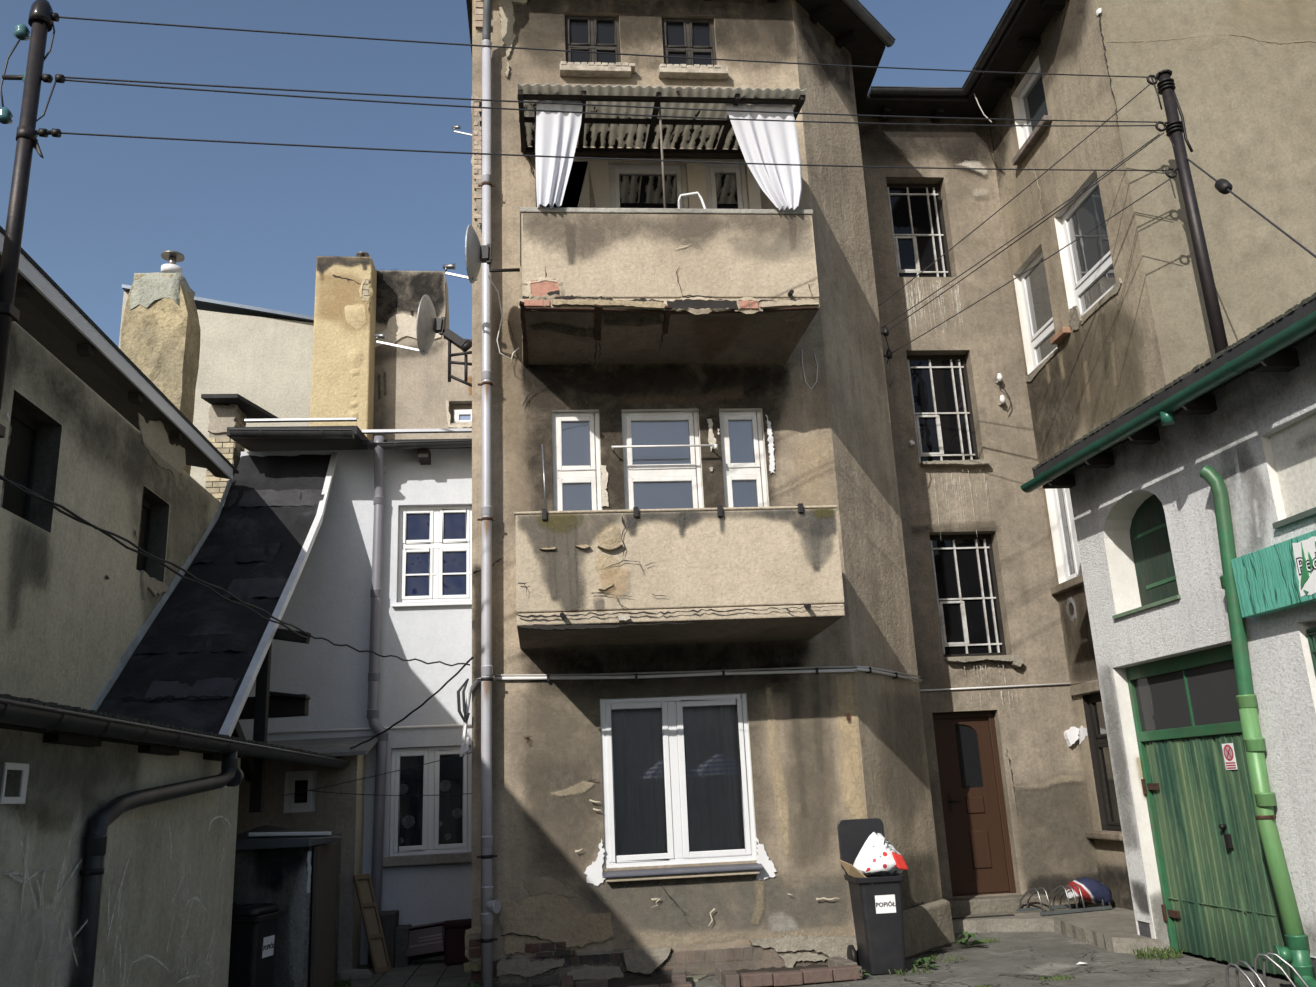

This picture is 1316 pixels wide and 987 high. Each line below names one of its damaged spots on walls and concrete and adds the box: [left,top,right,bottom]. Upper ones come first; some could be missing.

peeling [473,0,528,80]
flaking render [359,277,373,304]
spalling [518,277,819,367]
peeling [138,413,186,478]
damp [749,440,836,569]
damp [518,510,726,610]
damp [0,738,137,800]
spalling [465,927,481,961]
peeling [496,893,624,981]
peeling [749,934,857,968]